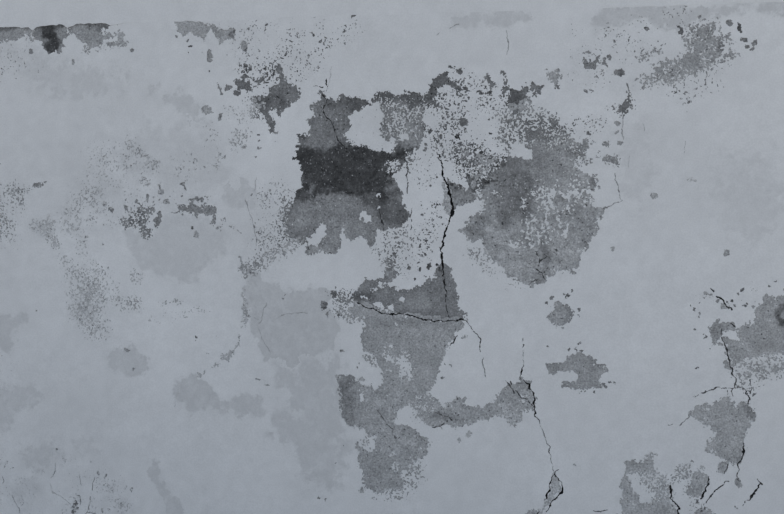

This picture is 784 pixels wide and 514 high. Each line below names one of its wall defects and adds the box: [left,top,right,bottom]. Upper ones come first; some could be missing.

water stain [39,25,63,54]
peeling [197,190,403,378]
water stain [292,138,419,227]
peeling [296,65,471,169]
crack [357,154,486,377]
peeling [325,253,538,502]
crack [505,339,563,514]
peeling [442,17,757,290]
crack [669,485,680,514]
peeling [619,289,784,514]
crack [668,288,752,426]
crack [700,443,745,503]